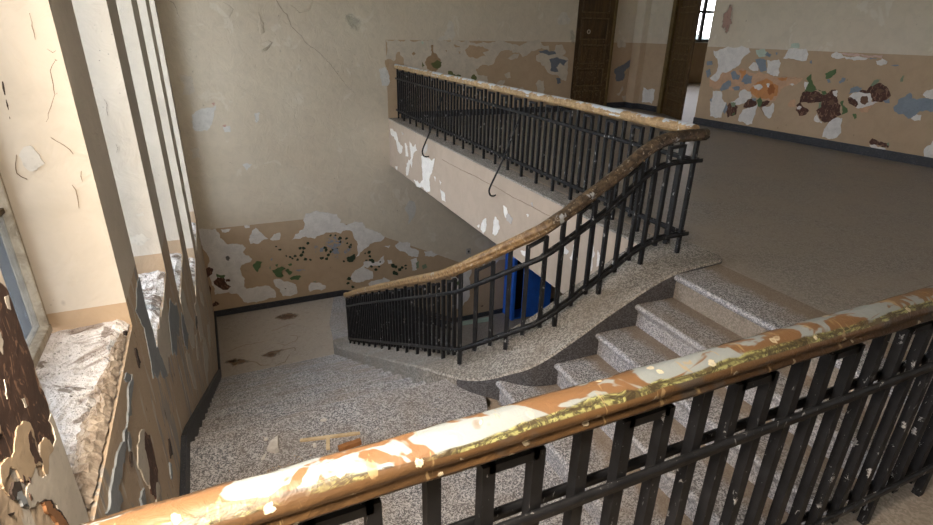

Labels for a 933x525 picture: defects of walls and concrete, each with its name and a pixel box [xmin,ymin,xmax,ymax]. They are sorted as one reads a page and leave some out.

crack [29,13,82,207]
peeling [192,102,216,131]
peeling [379,39,568,93]
peeling [706,43,933,139]
peeling [390,129,446,202]
peeling [869,138,889,150]
peeling [924,141,933,158]
peeling [477,205,513,235]
peeling [0,211,438,525]